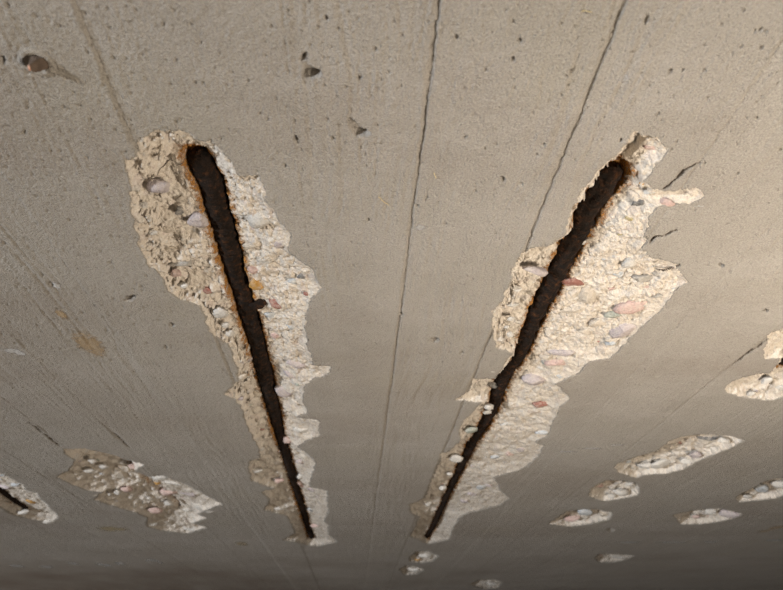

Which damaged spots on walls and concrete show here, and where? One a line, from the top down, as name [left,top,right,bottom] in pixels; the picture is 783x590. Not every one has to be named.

crack [663,161,700,189]
crack [650,229,678,243]
spalling [125,129,335,546]
corrosion [187,146,314,539]
corrosion [425,162,624,538]
spalling [400,131,704,575]
spalling [725,328,783,400]
corrosion [0,487,28,509]
spalling [0,473,58,524]
spalling [58,448,221,533]
spalling [549,434,743,526]
spalling [736,478,783,502]